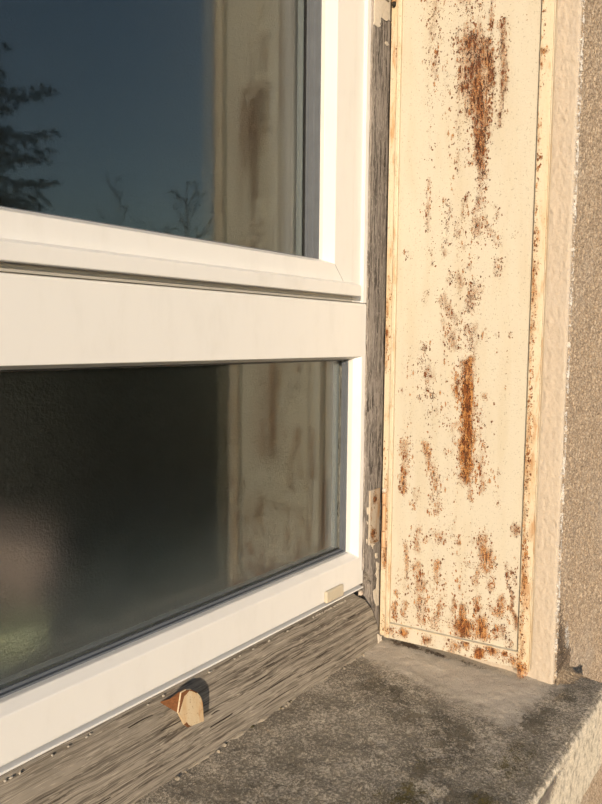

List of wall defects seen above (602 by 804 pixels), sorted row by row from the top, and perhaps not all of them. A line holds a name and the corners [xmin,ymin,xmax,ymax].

rust [370,491,388,569]
rust [381,0,543,680]